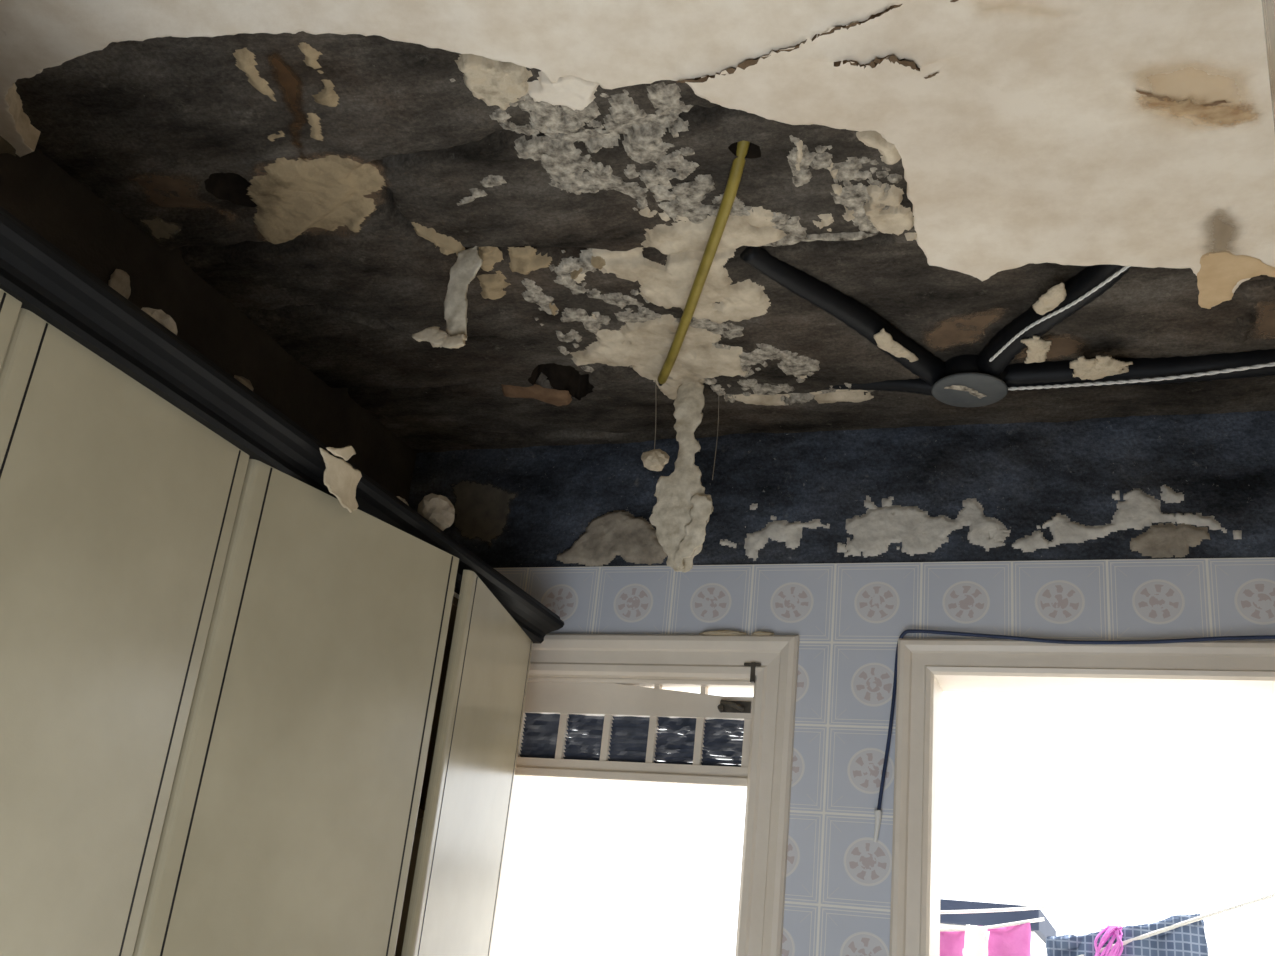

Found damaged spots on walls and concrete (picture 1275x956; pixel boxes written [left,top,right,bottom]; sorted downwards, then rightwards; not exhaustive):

crack [677,4,939,83]
leakage [1136,90,1255,125]
spalling [15,31,1275,568]